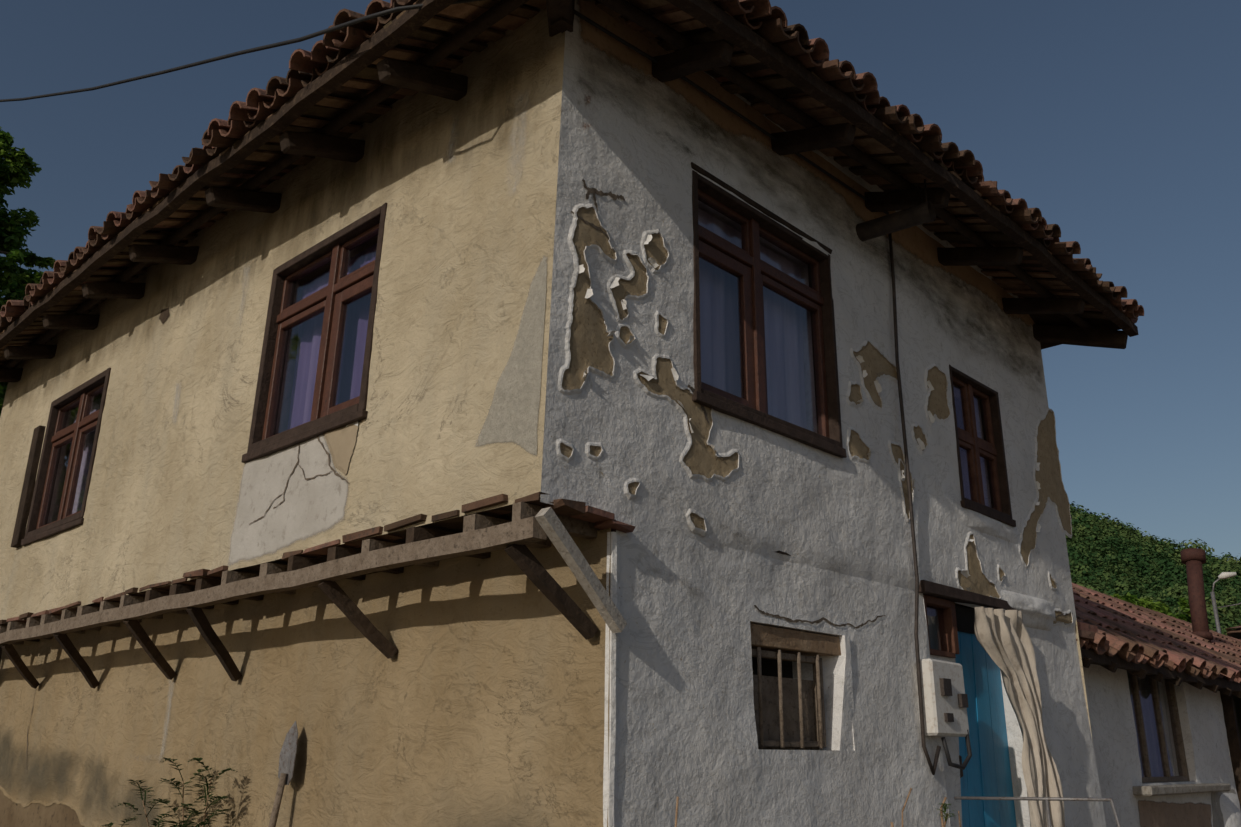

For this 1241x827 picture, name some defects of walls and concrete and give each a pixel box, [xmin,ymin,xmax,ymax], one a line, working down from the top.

peeling [557,203,670,395]
peeling [846,339,898,412]
crack [249,436,348,525]
peeling [555,438,605,463]
peeling [633,353,740,483]
peeling [846,427,872,464]
peeling [888,363,951,523]
peeling [1018,408,1072,569]
peeling [955,531,1006,599]
crack [754,605,885,629]
peeling [1053,608,1073,627]